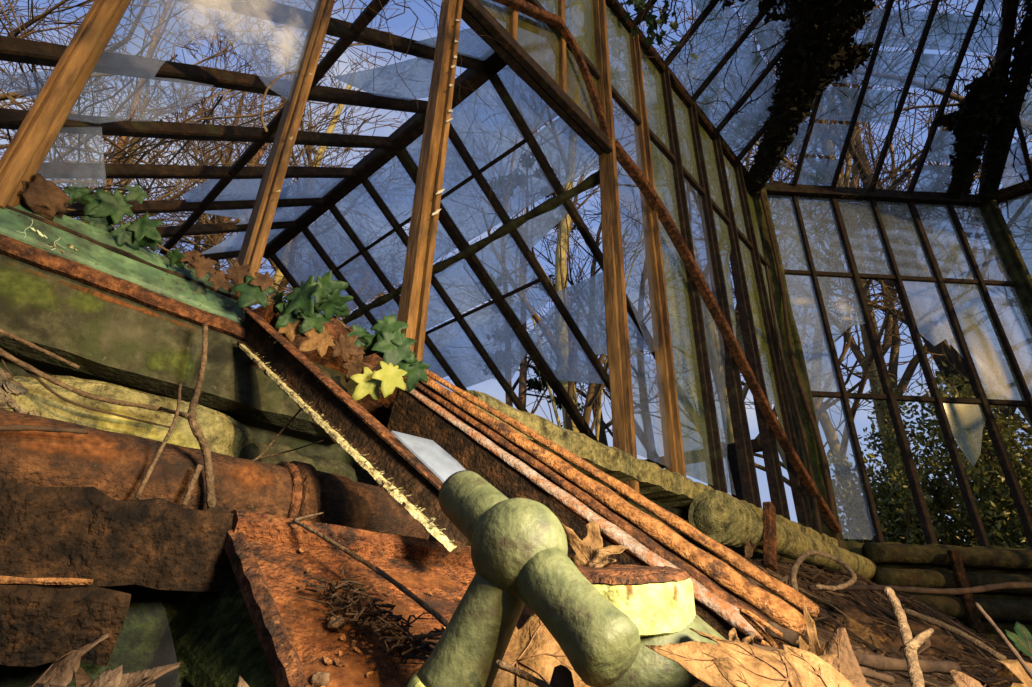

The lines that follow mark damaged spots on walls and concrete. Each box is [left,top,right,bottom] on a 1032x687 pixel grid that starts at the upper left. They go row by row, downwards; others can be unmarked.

rust [52,282,158,316]
rust [4,422,118,459]